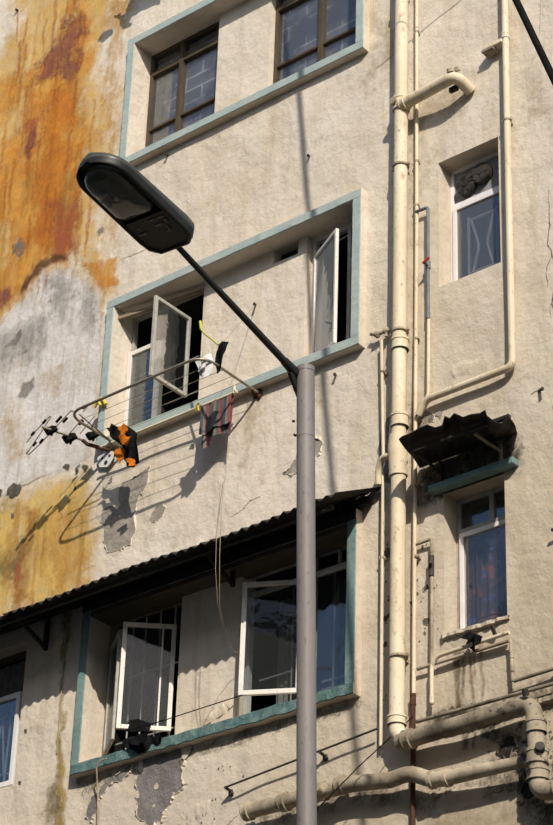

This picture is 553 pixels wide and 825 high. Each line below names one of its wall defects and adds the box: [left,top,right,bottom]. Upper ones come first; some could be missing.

rust [0,0,117,316]
crack [545,193,553,319]
spalling [283,453,297,476]
peeling [100,465,150,553]
peeling [150,503,167,523]
water stain [49,710,65,825]
spalling [85,745,192,825]